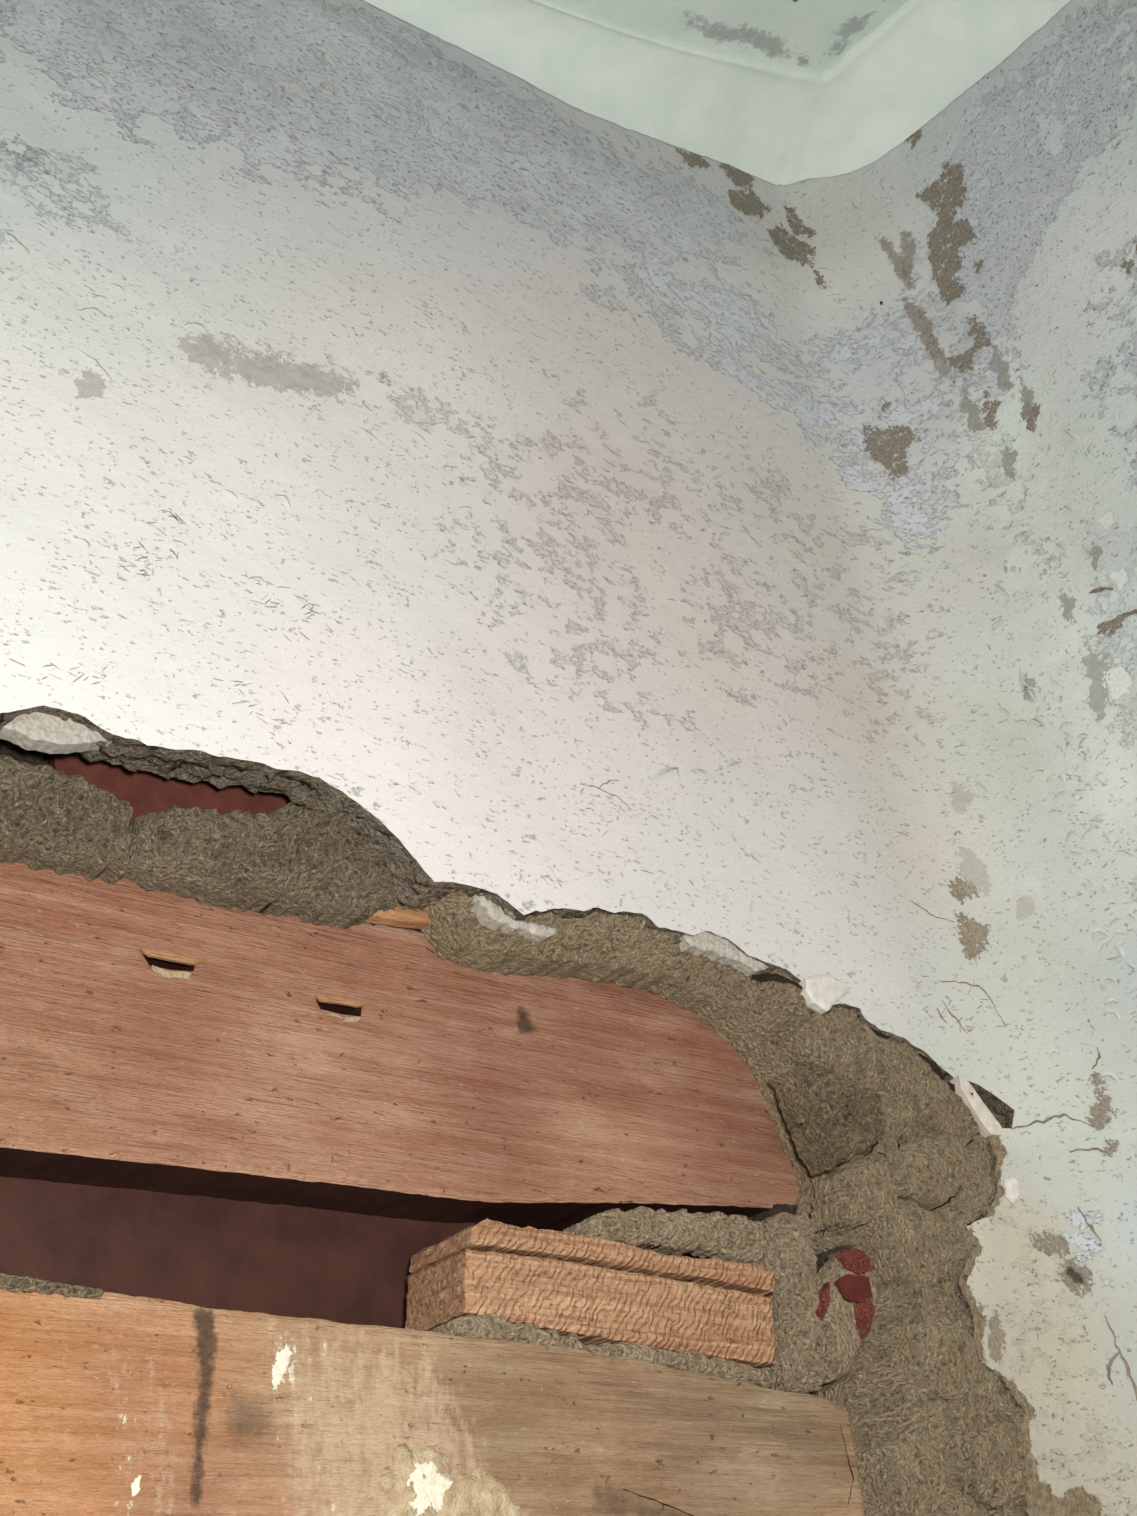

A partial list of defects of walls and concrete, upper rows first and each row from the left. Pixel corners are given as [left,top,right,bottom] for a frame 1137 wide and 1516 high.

flaking render [905,129,924,149]
flaking render [674,146,830,289]
flaking render [879,161,1042,479]
flaking render [861,401,921,481]
crack [1089,587,1137,639]
peeling [0,712,112,754]
peeling [998,588,1116,813]
flaking render [911,838,991,963]
flaking render [399,886,1120,1516]